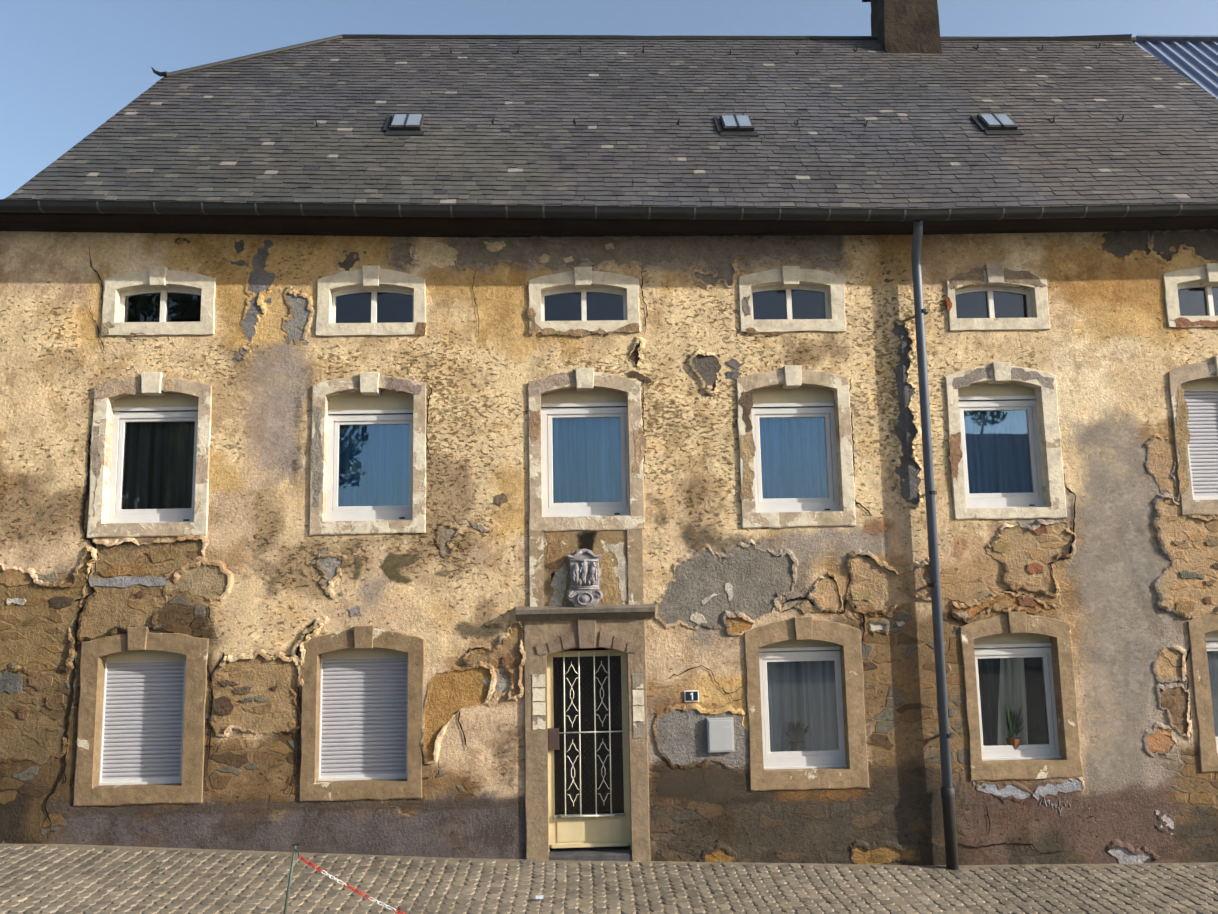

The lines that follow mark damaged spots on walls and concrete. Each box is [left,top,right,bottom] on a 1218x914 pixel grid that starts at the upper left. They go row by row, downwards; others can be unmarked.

crack [89,248,106,355]
peeling [173,234,196,248]
peeling [230,235,316,360]
peeling [1100,229,1218,266]
peeling [687,349,756,501]
peeling [888,319,923,509]
crack [44,427,98,838]
flaking render [420,619,526,766]
peeling [653,538,931,637]
crack [782,555,895,645]
flaking render [949,519,1077,625]
water stain [1079,415,1165,782]